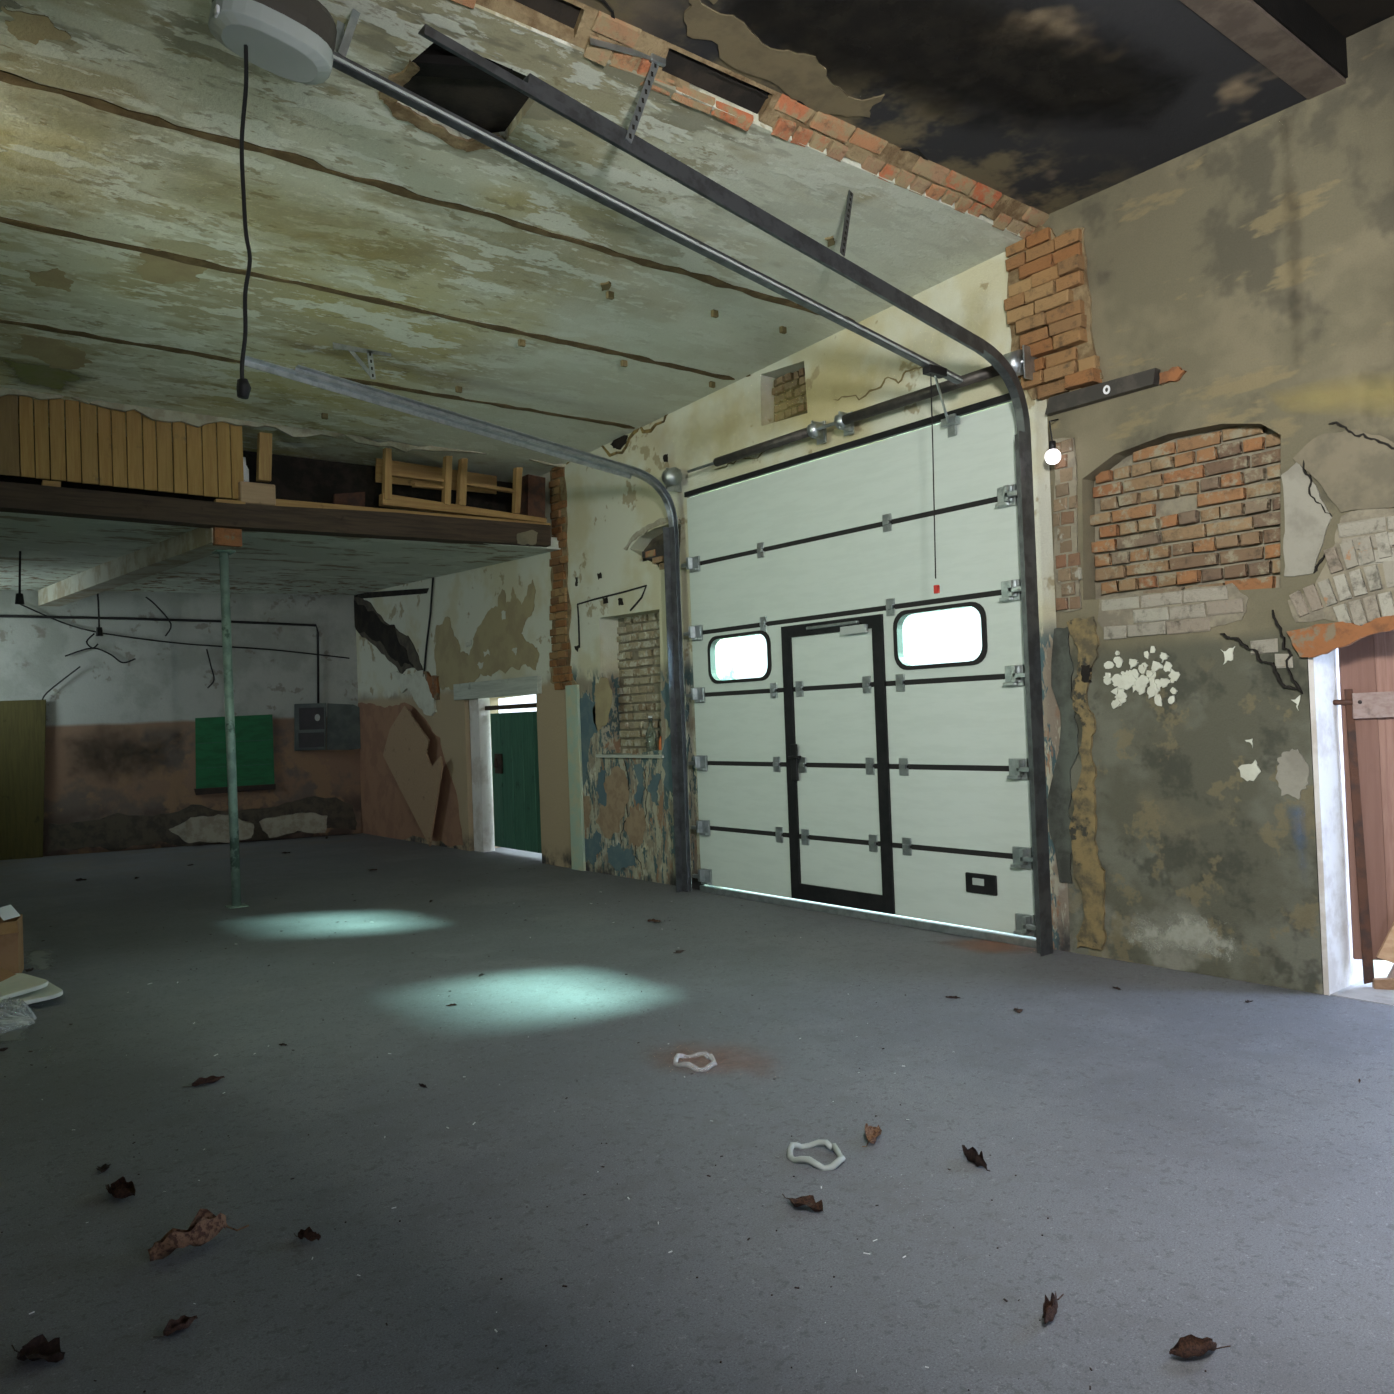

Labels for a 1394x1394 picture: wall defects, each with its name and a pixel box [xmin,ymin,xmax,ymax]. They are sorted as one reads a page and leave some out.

spalling [379,43,529,152]
flaking render [583,11,753,131]
flaking render [684,0,1102,400]
crack [1302,460,1332,516]
crack [1329,421,1394,450]
peeling [434,459,613,807]
peeling [633,682,689,806]
spalling [1047,438,1248,950]
crack [1220,610,1303,694]
peeling [1238,739,1310,800]
flaking render [1220,508,1394,668]
crack [1313,554,1325,573]